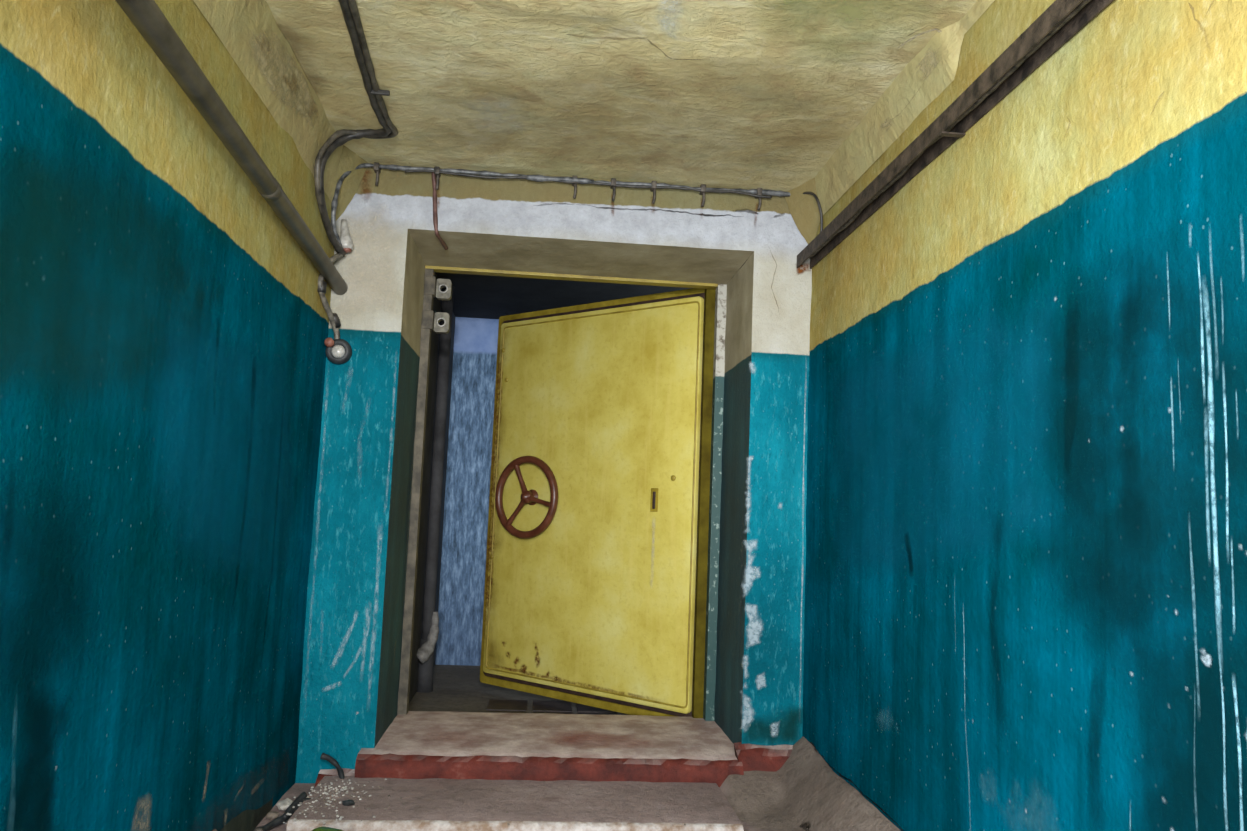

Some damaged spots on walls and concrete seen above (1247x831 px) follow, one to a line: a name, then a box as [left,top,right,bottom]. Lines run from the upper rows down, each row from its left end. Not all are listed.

peeling [743,541,765,726]
peeling [133,799,149,831]
crack [810,742,904,831]